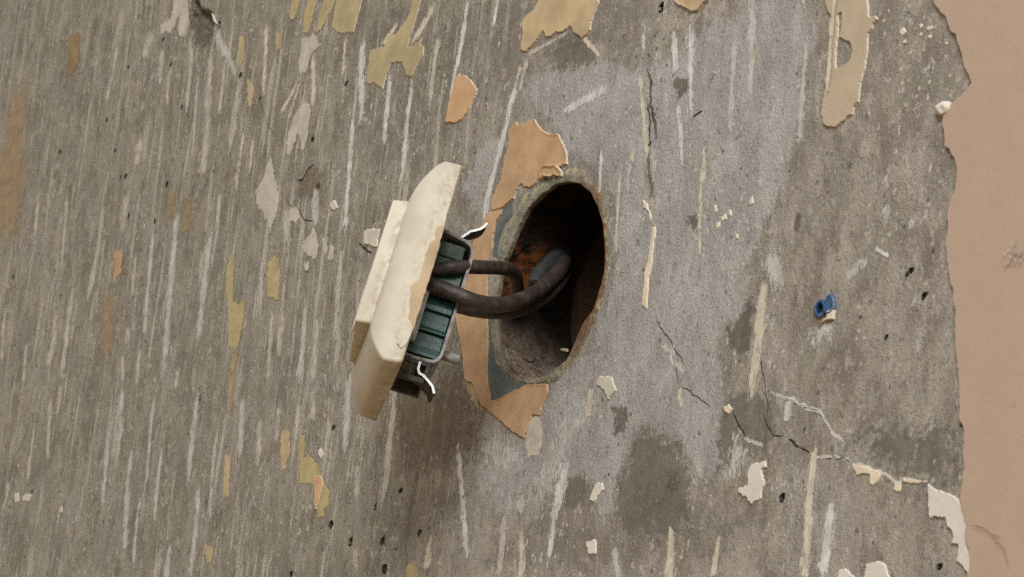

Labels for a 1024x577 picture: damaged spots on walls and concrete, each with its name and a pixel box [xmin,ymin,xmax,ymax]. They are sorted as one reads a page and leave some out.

peeling [368,0,424,89]
peeling [445,74,478,123]
peeling [520,0,600,52]
peeling [821,0,879,128]
peeling [455,119,608,438]
crack [656,318,928,492]